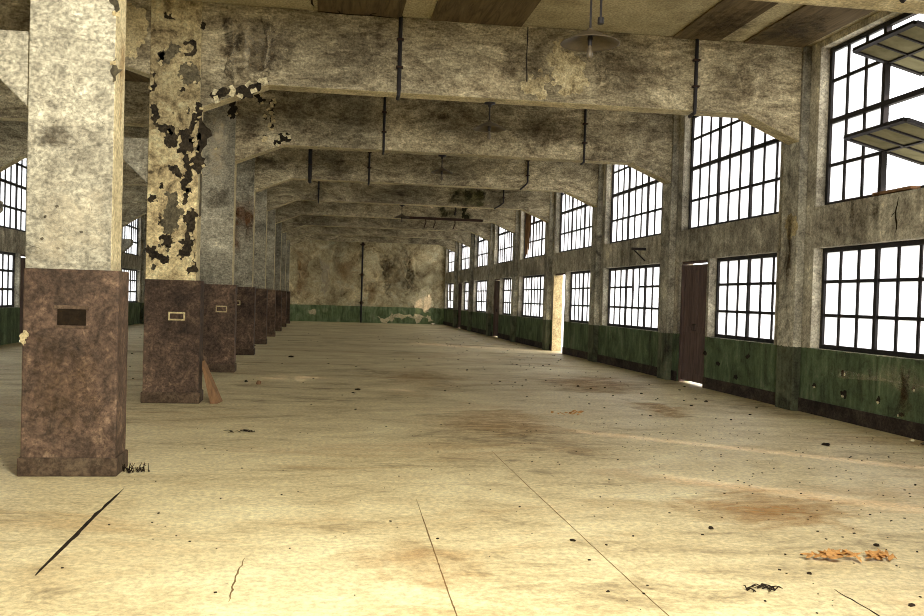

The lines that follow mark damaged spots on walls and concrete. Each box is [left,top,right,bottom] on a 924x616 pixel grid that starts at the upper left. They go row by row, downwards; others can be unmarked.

peeling [109,0,149,84]
peeling [148,39,201,92]
spalling [209,77,292,147]
peeling [145,102,212,274]
peeling [378,286,434,324]